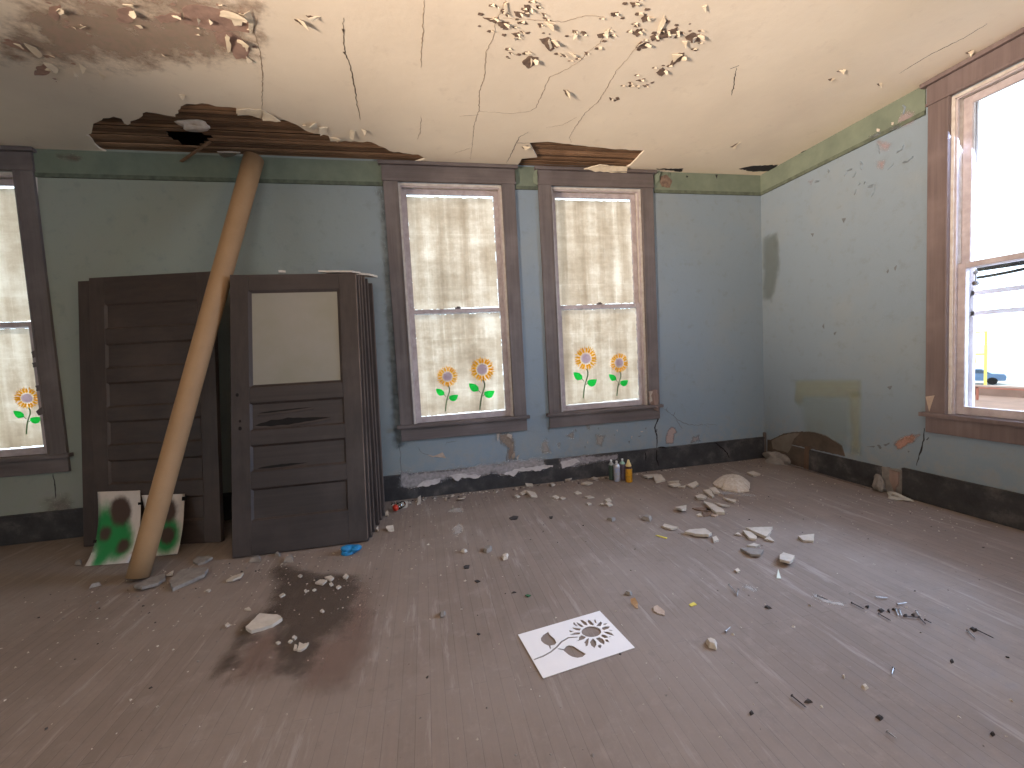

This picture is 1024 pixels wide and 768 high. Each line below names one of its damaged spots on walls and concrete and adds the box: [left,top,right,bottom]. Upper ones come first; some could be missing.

peeling [2,0,261,83]
crack [254,18,263,105]
crack [342,18,361,120]
crack [456,1,636,159]
peeling [478,0,705,102]
flaking render [89,95,423,162]
flaking render [516,142,643,185]
crack [645,406,729,466]
spalling [762,431,845,470]
water stain [264,566,354,673]